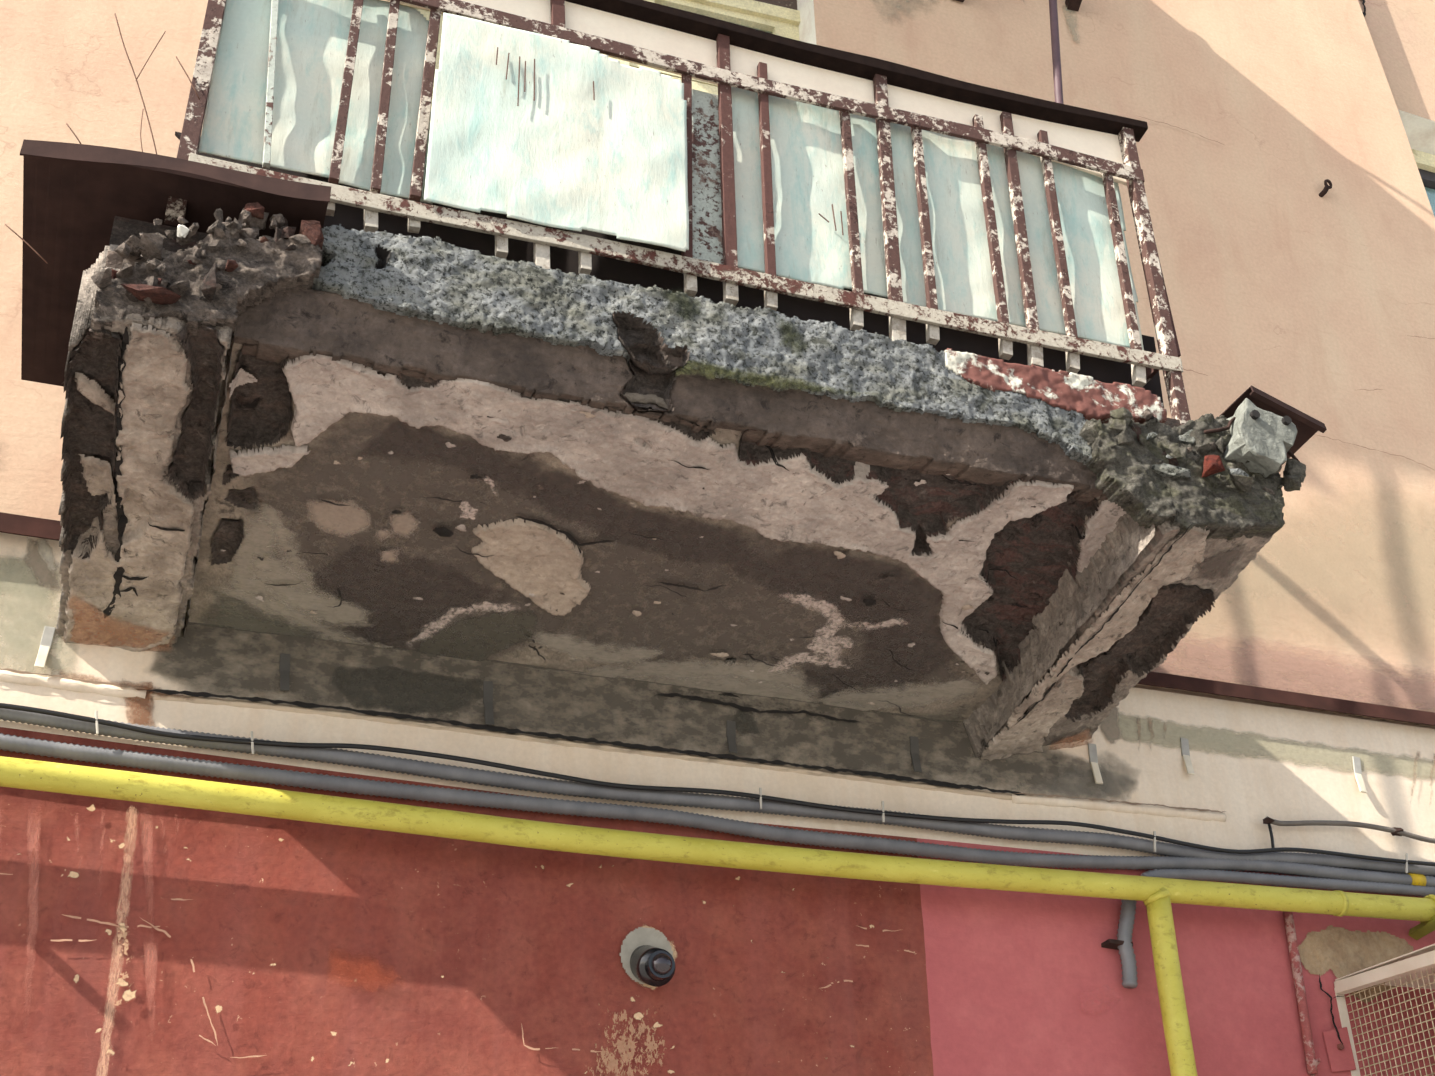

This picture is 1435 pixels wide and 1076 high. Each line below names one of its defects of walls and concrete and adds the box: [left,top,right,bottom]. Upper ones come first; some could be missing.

spalling [91,202,324,306]
spalling [375,244,391,269]
crack [103,327,185,619]
flaking render [26,310,1126,685]
crack [765,445,789,471]
spalling [1079,407,1306,495]
crack [264,552,342,608]
crack [934,540,1027,607]
crack [509,635,545,660]
spalling [980,526,1215,761]
crack [0,668,1225,813]
flaking render [1298,925,1414,978]